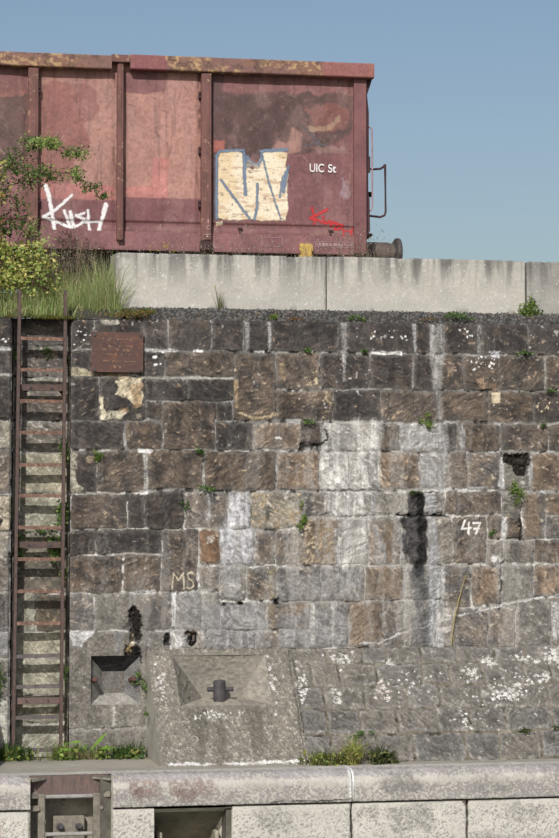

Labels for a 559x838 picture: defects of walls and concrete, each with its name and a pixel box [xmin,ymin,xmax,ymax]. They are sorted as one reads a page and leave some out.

efflorescence [429,325,444,393]
peeling [71,367,143,420]
peeling [3,421,11,447]
hole [503,452,530,476]
peeling [0,495,11,530]
water stain [399,406,446,647]